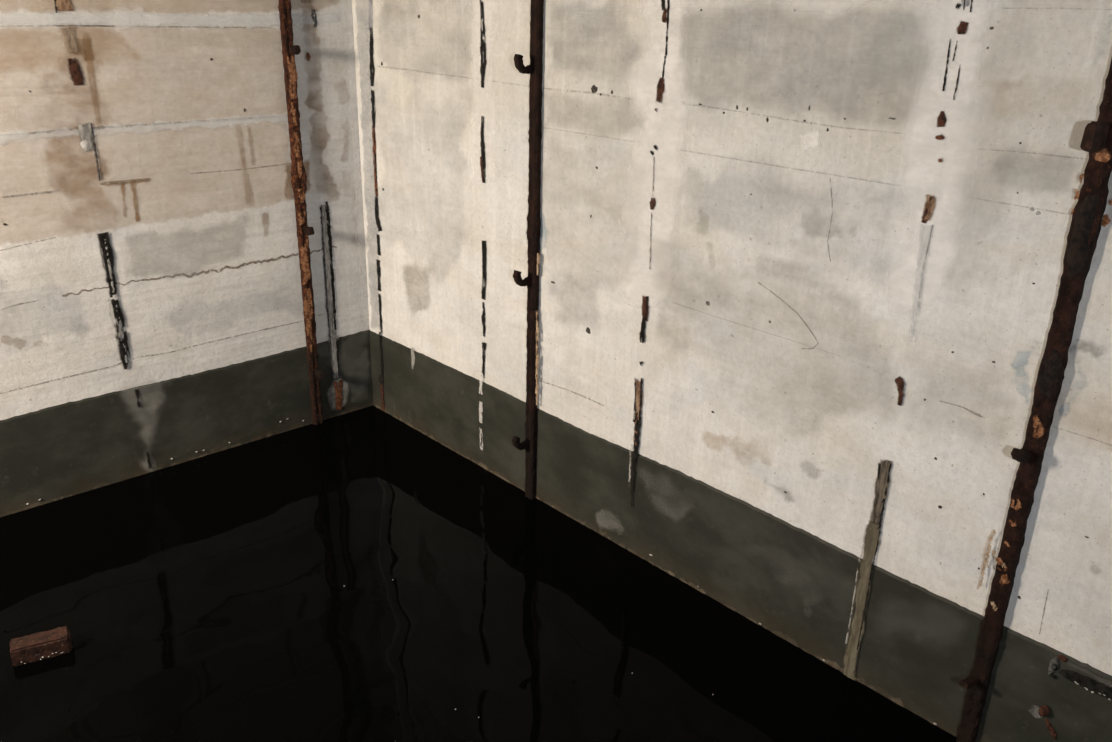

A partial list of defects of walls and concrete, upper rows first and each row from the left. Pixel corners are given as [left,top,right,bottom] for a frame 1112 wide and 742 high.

rust [56,0,74,11]
crack [310,10,318,27]
rust [68,58,84,86]
rust [655,78,665,112]
crack [0,116,286,185]
crack [369,0,385,410]
crack [0,201,339,408]
damp [0,329,984,737]
damp [976,626,1112,742]